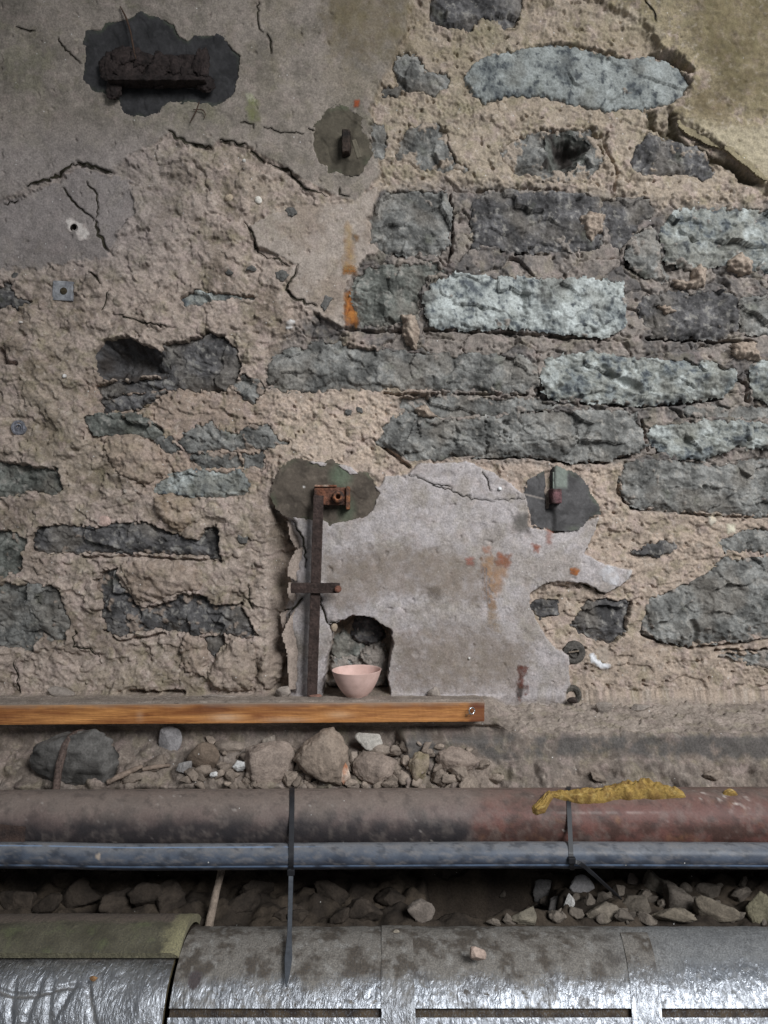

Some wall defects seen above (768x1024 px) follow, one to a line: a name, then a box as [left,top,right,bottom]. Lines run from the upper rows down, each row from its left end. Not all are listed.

spalling [83,11,241,117]
crack [168,121,349,197]
spalling [312,104,468,176]
crack [5,162,112,252]
spalling [0,282,32,311]
crack [88,271,174,328]
crack [244,222,316,306]
corrosion [345,292,358,324]
spalling [84,120,768,697]
spalling [0,462,63,500]
spalling [0,521,222,651]
corrosion [517,665,527,696]